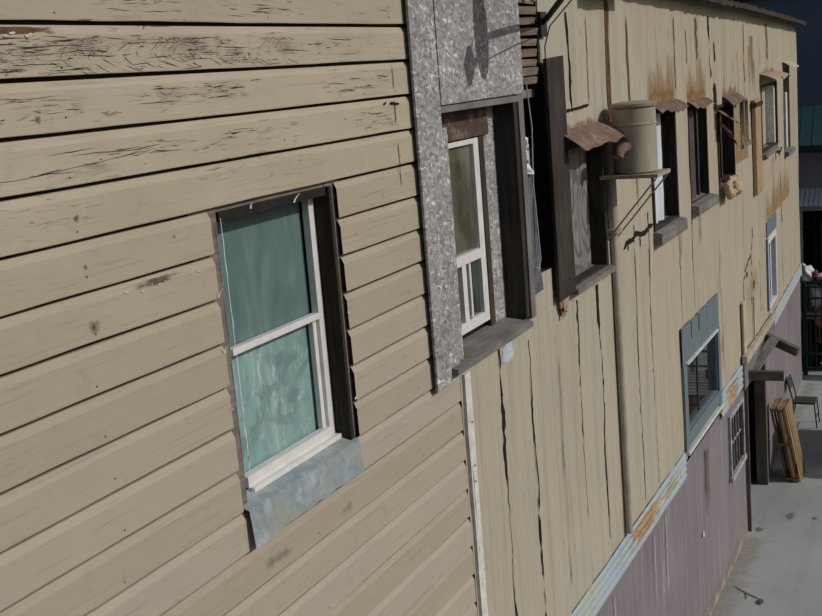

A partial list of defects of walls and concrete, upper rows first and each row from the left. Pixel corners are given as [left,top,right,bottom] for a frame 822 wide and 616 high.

peeling [0,27,299,76]
corrosion [649,56,676,103]
crack [577,284,611,538]
crack [498,349,518,616]
corrosion [634,506,653,541]